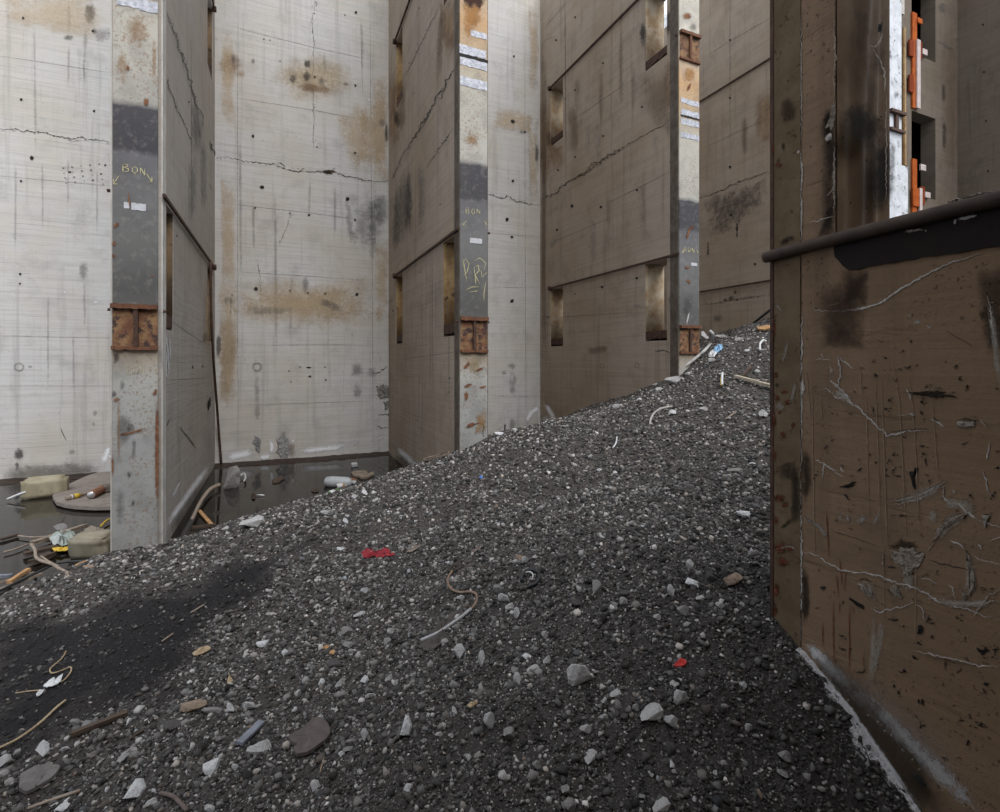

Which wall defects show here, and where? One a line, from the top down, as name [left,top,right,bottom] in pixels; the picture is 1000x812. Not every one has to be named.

crack [161,1,454,182]
crack [2,128,109,144]
crack [489,127,660,205]